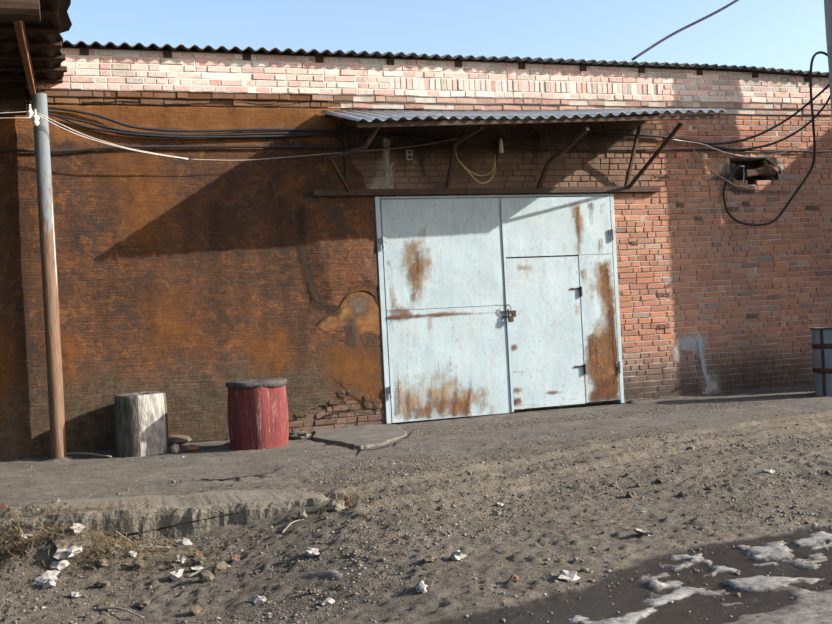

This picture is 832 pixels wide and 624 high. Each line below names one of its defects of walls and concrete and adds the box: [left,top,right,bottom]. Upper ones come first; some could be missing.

spalling [728,159,782,211]
rust [403,235,431,301]
peeling [317,289,382,346]
rust [387,289,480,328]
rust [583,261,620,402]
damp [644,334,777,397]
spalling [289,389,384,433]
rust [397,375,493,420]